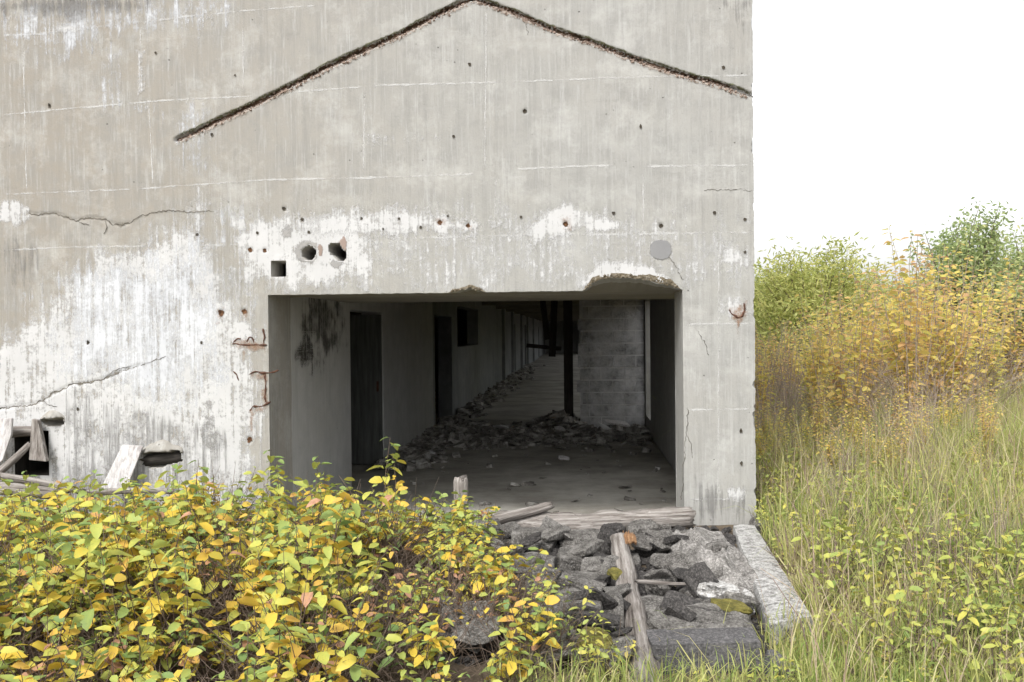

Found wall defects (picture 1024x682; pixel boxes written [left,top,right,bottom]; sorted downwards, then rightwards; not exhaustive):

crack [30,210,214,234]
spalling [579,261,680,290]
crack [0,356,165,409]
damp [0,187,748,526]